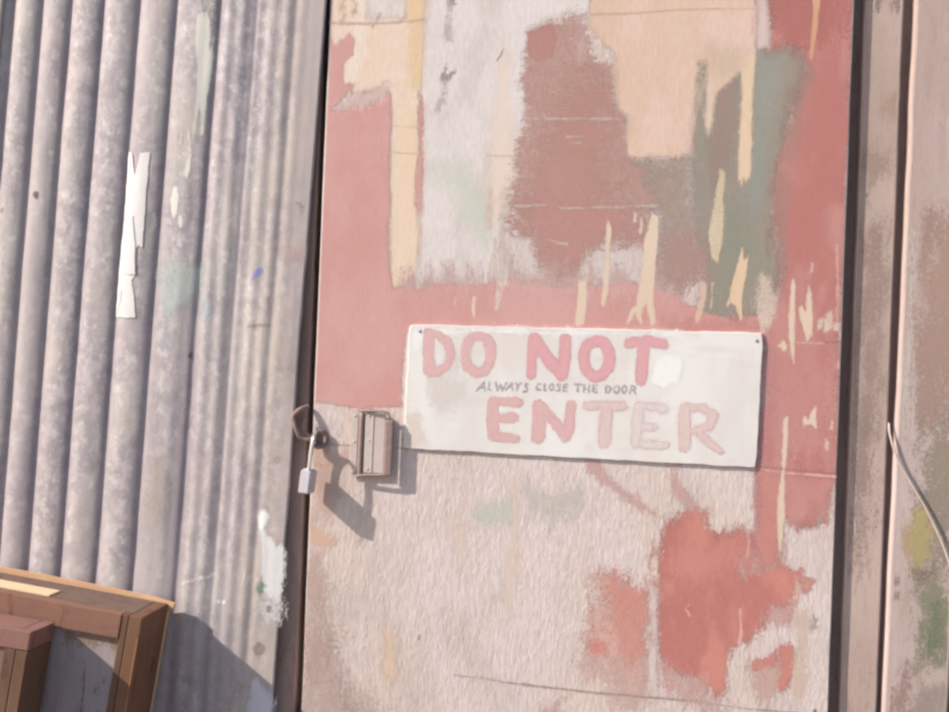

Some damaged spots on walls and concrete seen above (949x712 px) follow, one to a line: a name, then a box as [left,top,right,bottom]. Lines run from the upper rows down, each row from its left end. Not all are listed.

water stain [900,199,949,590]